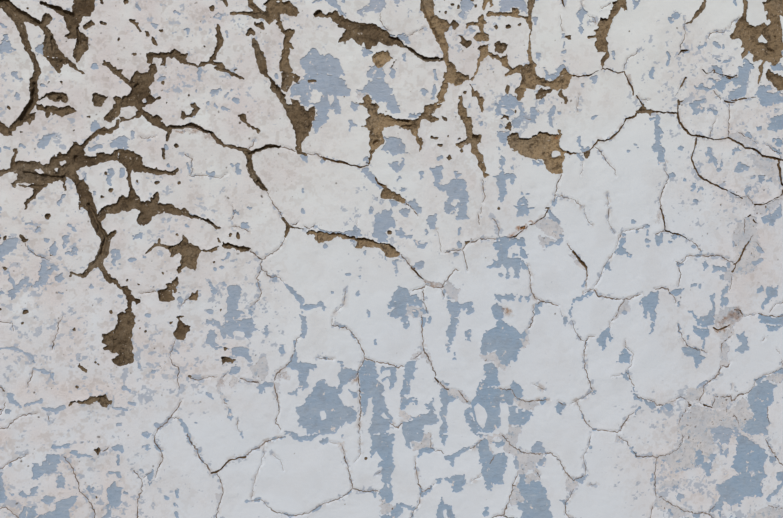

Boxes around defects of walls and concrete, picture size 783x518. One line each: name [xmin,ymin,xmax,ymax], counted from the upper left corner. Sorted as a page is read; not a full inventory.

spalling [36,104,76,118]
crack [0,0,384,366]
spalling [180,5,260,134]
flaking render [245,0,640,279]
crack [678,0,706,55]
peeling [677,0,783,368]
flaking render [169,315,191,354]
flaking render [110,206,252,305]
crack [134,53,783,518]
flaking render [0,385,136,414]
crack [64,457,96,518]
peeling [616,348,783,518]